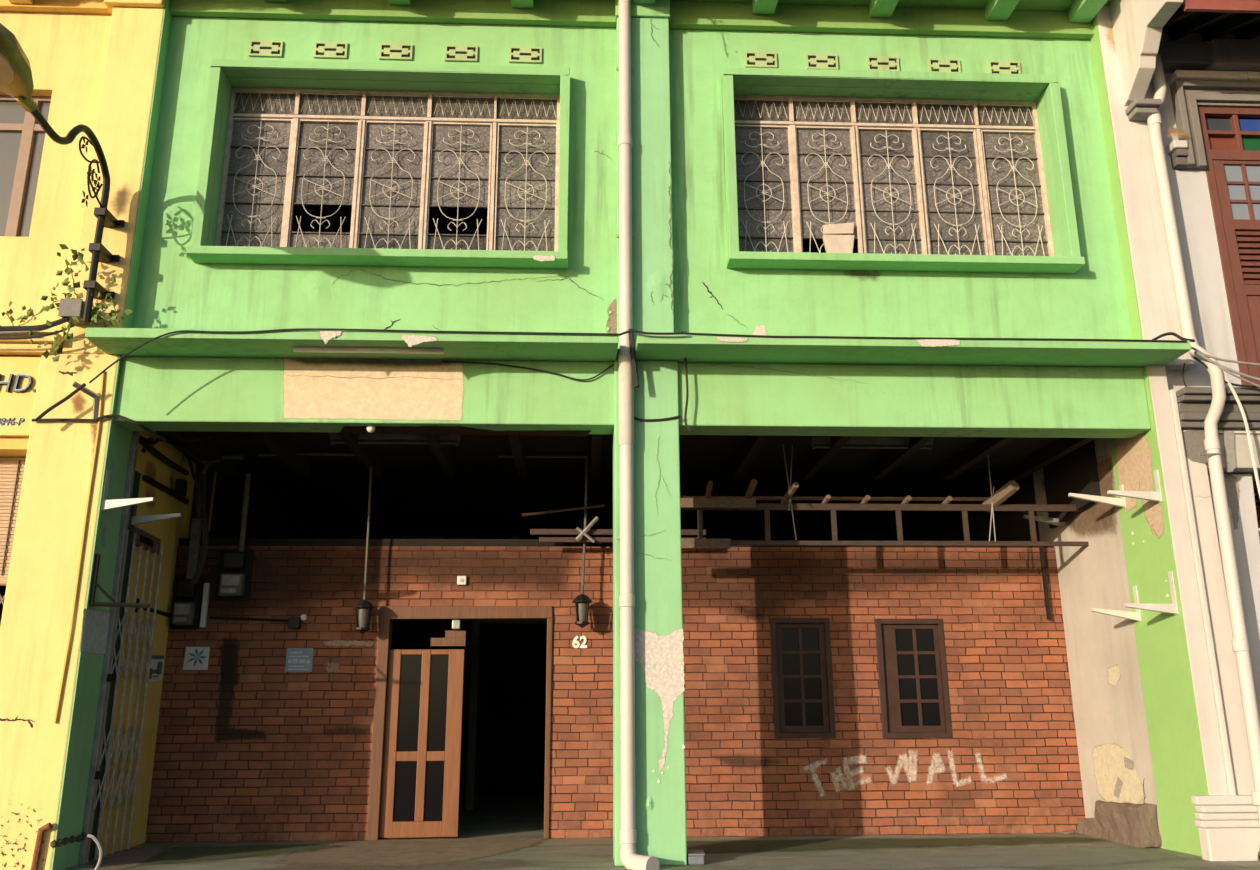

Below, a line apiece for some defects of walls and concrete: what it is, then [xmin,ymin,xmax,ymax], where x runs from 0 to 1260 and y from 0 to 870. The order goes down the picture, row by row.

crack [332,269,600,298]
crack [651,162,674,314]
crack [702,282,747,328]
crack [636,436,671,561]
peeling [1115,433,1164,545]
peeling [634,627,685,783]
peeling [1092,743,1144,804]